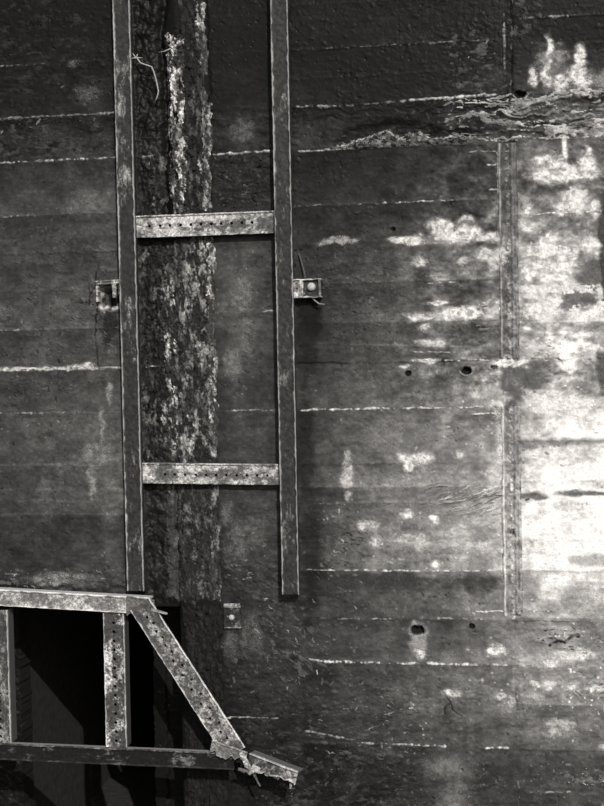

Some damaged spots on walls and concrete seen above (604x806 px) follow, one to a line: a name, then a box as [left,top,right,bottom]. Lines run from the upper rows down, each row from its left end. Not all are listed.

leakage [529,39,604,92]
spalling [332,30,604,150]
leakage [320,236,357,245]
leakage [390,234,422,245]
leakage [428,215,510,272]
leakage [521,137,604,321]
leakage [431,300,484,321]
leakage [492,345,596,412]
leakage [340,454,353,497]
leakage [399,453,434,471]
spalling [411,479,503,518]
leakage [520,492,547,500]